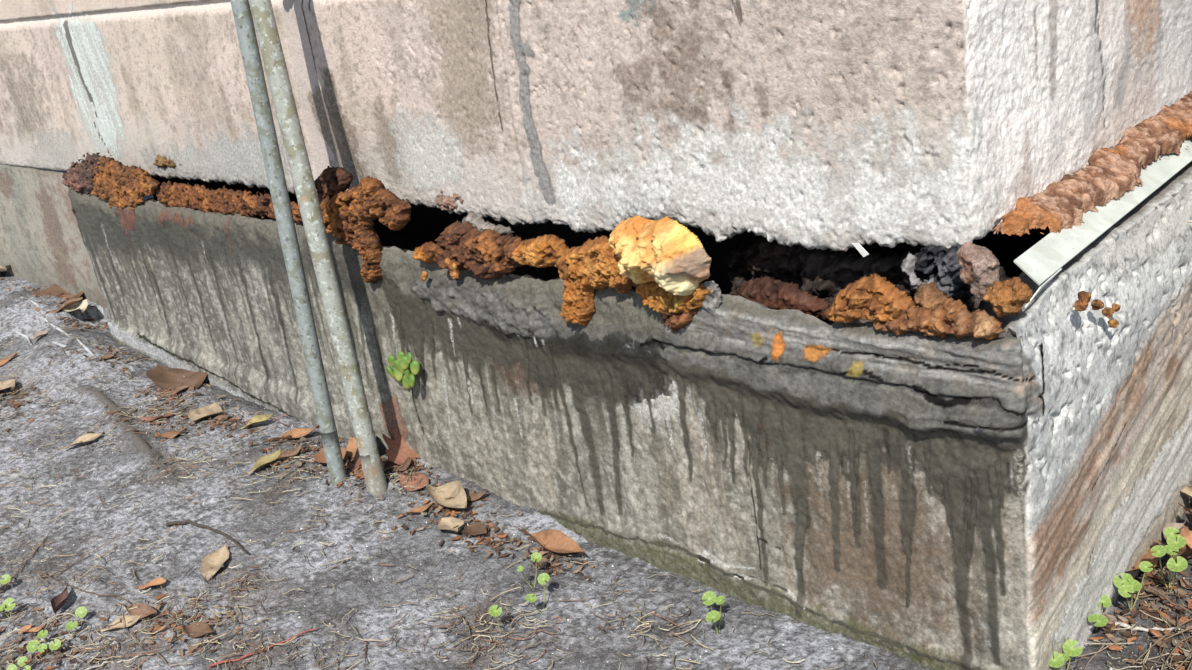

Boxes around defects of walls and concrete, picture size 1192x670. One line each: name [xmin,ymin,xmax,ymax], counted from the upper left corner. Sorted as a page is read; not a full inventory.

crack [485,0,555,204]
spalling [684,224,742,239]
spalling [763,234,838,251]
peeling [852,243,869,257]
leakage [74,209,296,417]
crack [640,340,665,351]
rust [753,332,785,360]
rust [803,345,831,362]
crack [806,343,1045,431]
leakage [336,265,1028,670]